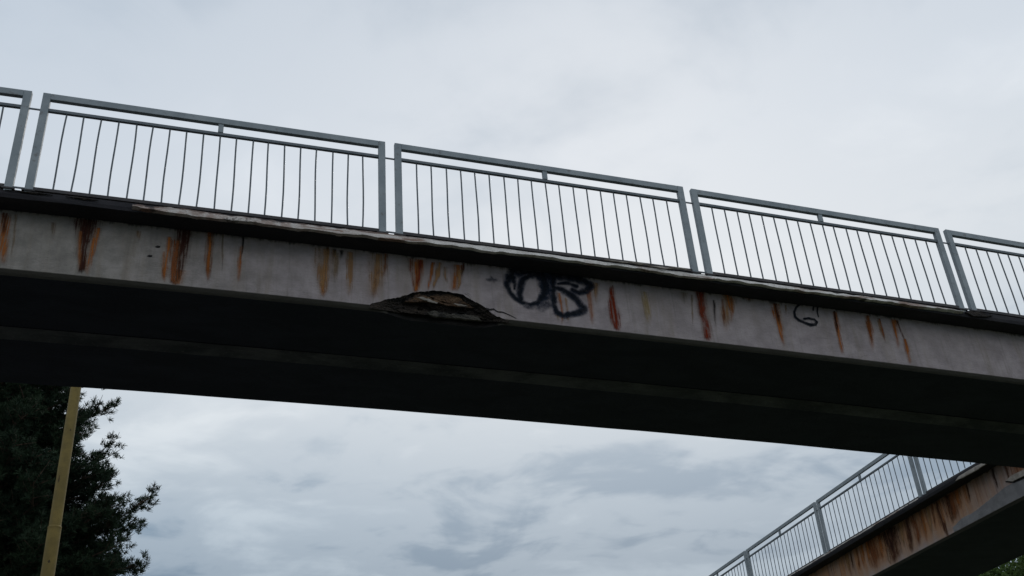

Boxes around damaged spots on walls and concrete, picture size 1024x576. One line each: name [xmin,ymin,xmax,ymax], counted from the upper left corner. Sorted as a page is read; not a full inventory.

corrosion [74,218,101,273]
corrosion [162,229,192,283]
corrosion [315,247,353,293]
corrosion [410,258,465,291]
spalling [370,291,509,323]
corrosion [587,283,621,330]
corrosion [683,291,735,339]
corrosion [772,303,787,341]
corrosion [833,311,843,351]
corrosion [866,315,910,362]